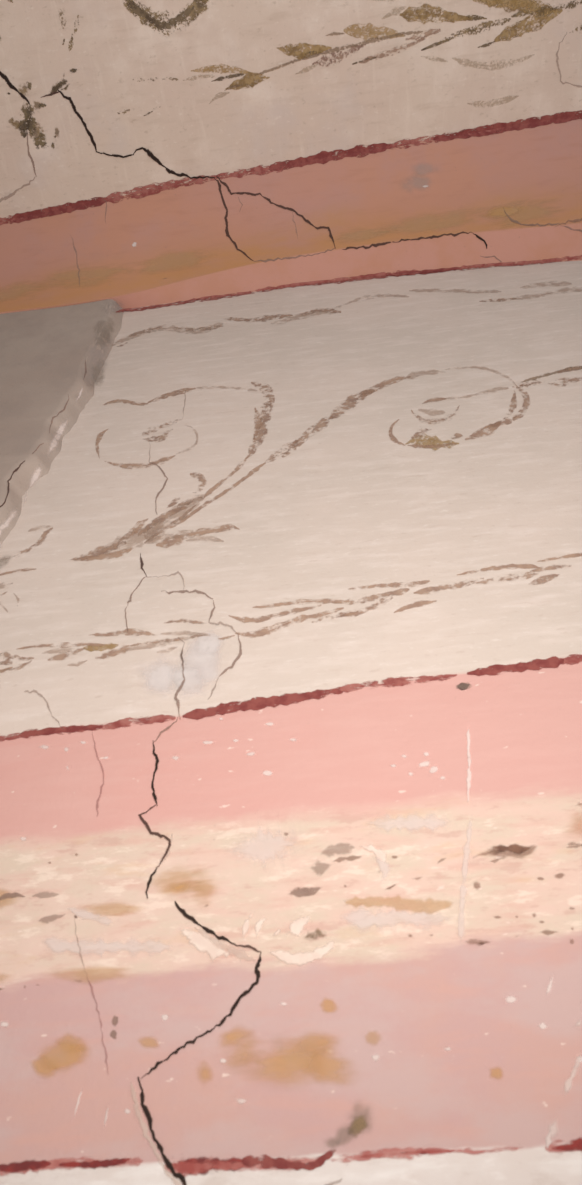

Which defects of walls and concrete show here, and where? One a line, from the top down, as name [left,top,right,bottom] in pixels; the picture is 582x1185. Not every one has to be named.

crack [0,71,502,262]
crack [503,207,582,232]
crack [150,462,168,514]
crack [125,553,215,631]
crack [131,634,262,1185]